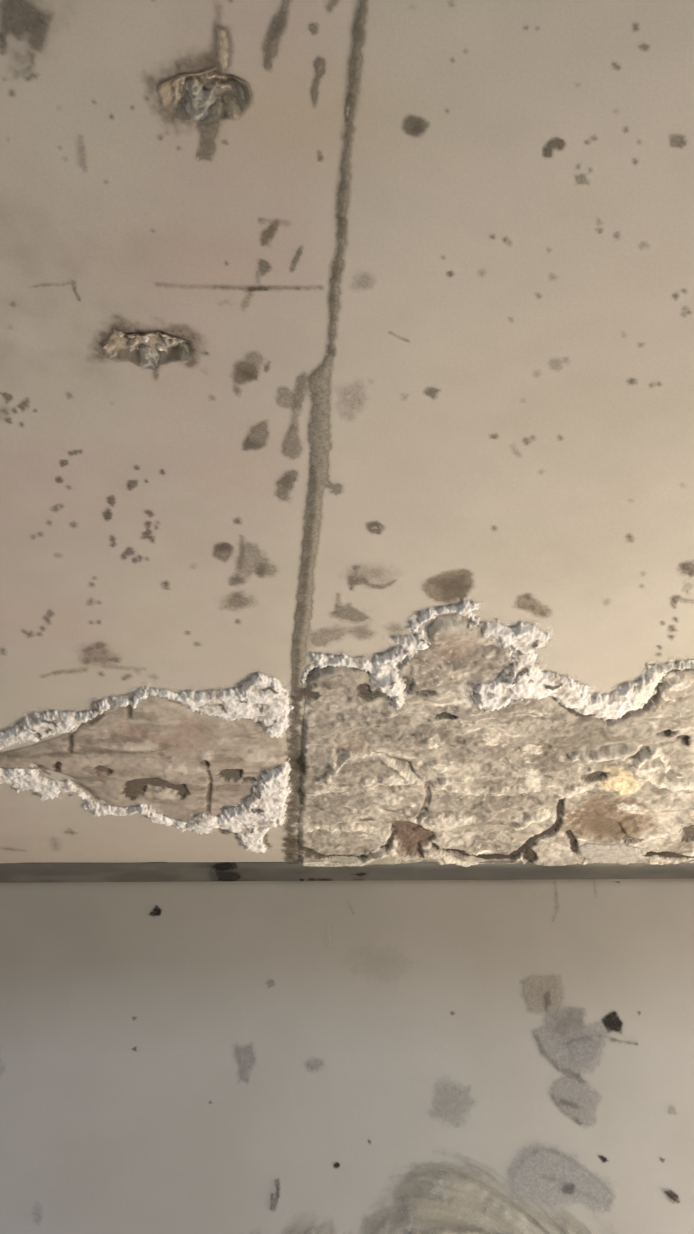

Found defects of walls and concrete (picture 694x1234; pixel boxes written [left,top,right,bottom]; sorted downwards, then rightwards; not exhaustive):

spalling [152,26,252,161]
spalling [97,320,197,379]
crack [265,0,588,864]
damp [300,567,694,721]
crack [0,715,153,800]
damp [0,758,292,853]
damp [0,672,294,750]
crack [205,770,213,812]
spalling [0,614,694,867]
damp [210,862,241,881]
crack [644,851,694,859]